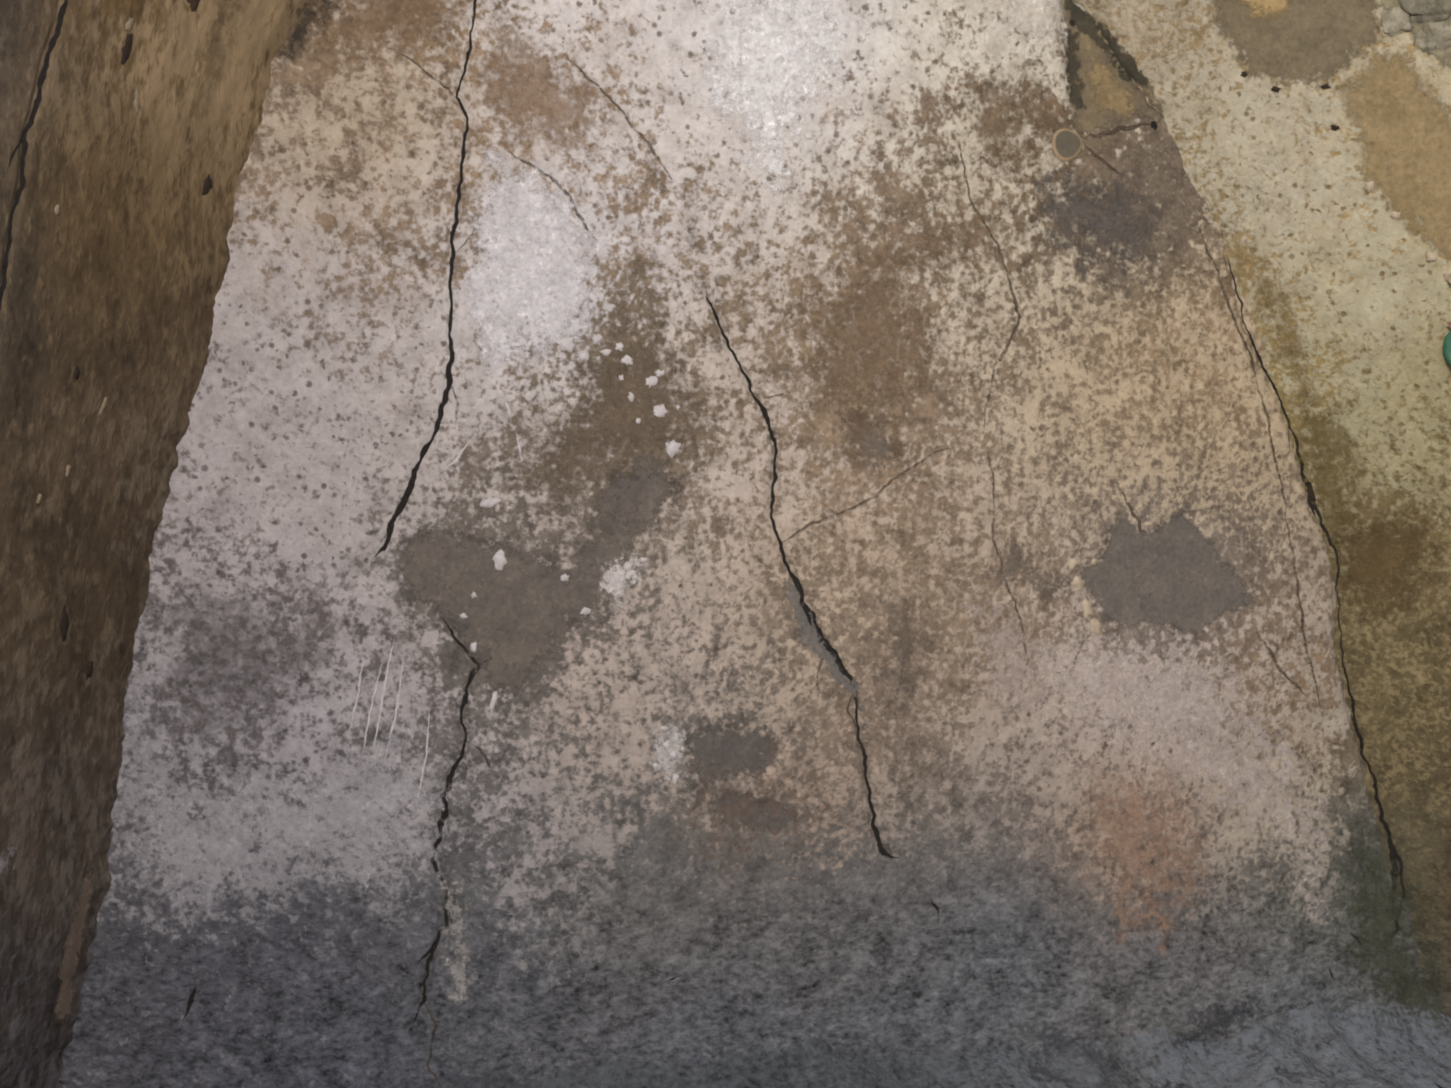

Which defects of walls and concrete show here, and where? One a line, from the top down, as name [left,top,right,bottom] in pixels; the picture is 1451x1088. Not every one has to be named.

crack [0,0,68,350]
crack [373,0,479,558]
water stain [464,150,600,374]
water stain [484,16,612,149]
crack [504,149,601,248]
flaking render [1060,0,1162,138]
water stain [599,553,644,613]
crack [706,288,949,858]
crack [1199,227,1406,945]
crack [412,616,499,1085]